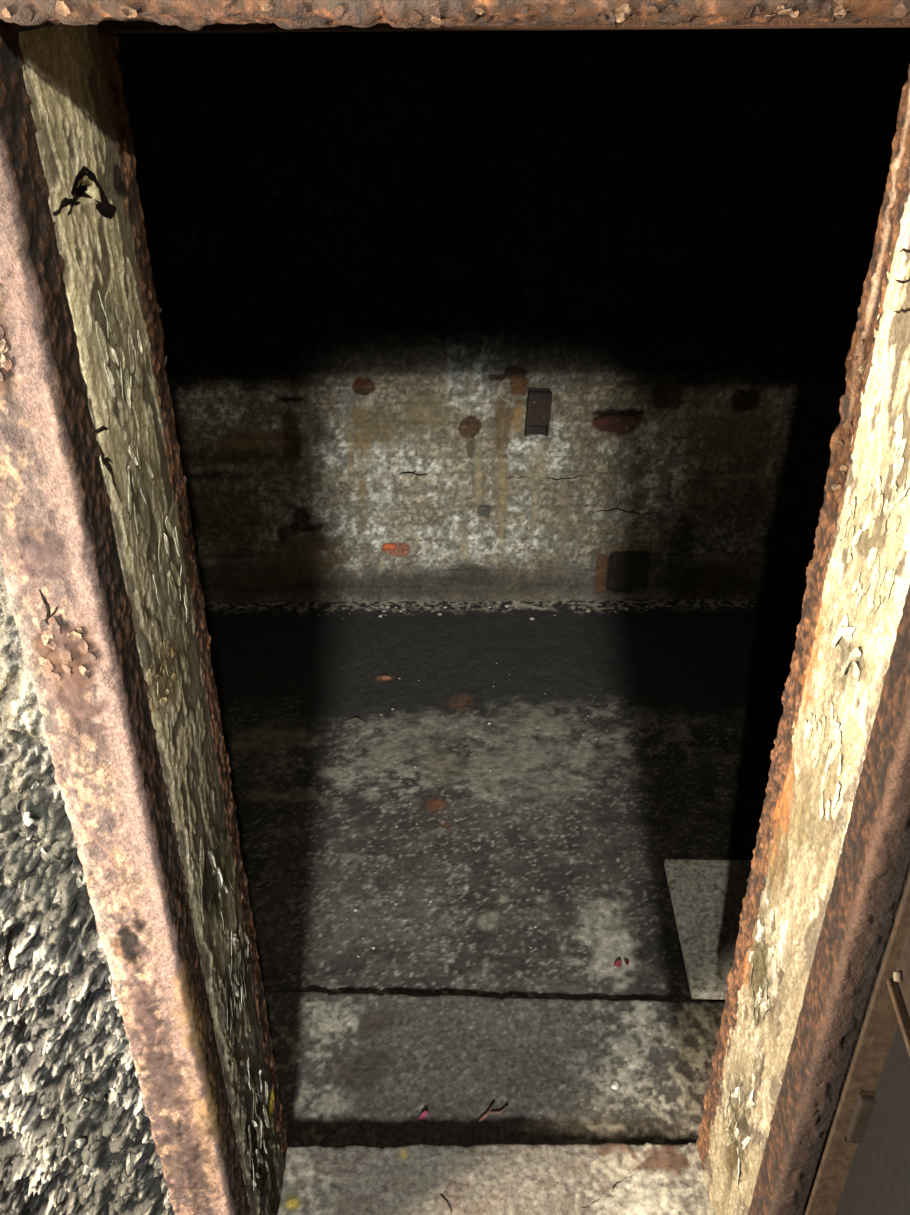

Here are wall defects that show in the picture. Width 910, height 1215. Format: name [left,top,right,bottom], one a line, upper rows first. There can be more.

corrosion [2,6,33,23]
corrosion [55,0,71,17]
corrosion [117,2,140,18]
corrosion [410,6,442,25]
corrosion [597,3,676,28]
corrosion [744,0,853,23]
corrosion [892,3,908,19]
corrosion [0,323,13,391]
corrosion [34,616,100,736]
corrosion [774,766,794,828]
corrosion [175,961,204,1044]
corrosion [131,983,227,1210]